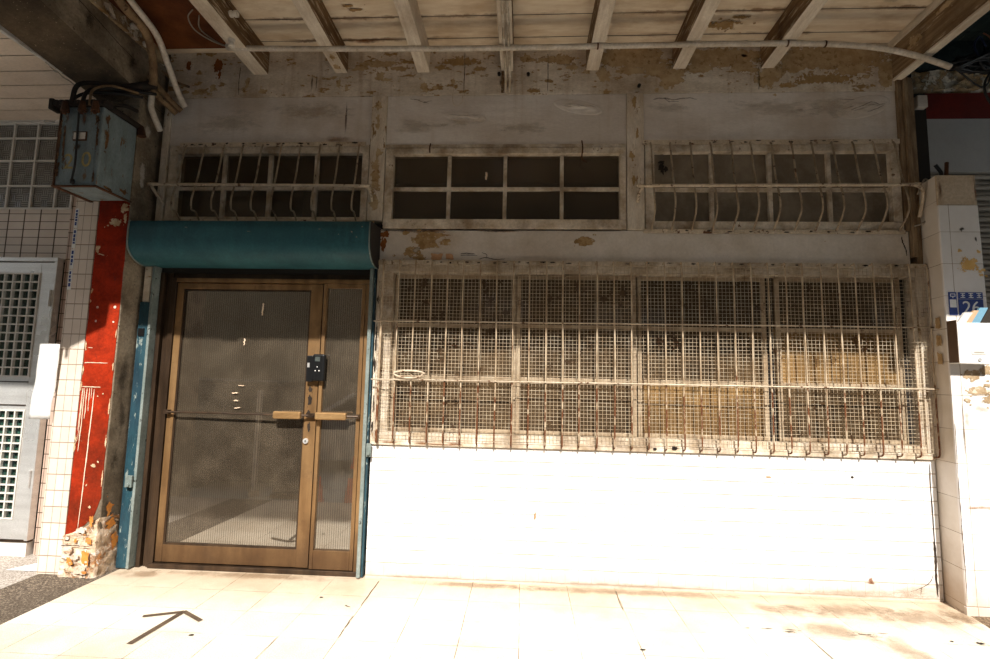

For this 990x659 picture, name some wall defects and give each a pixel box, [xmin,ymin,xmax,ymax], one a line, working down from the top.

peeling [182,59,226,98]
peeling [328,53,438,93]
peeling [430,52,494,87]
peeling [518,47,893,96]
spalling [911,70,990,94]
spalling [574,234,596,246]
peeling [960,365,990,409]
spalling [57,496,120,578]